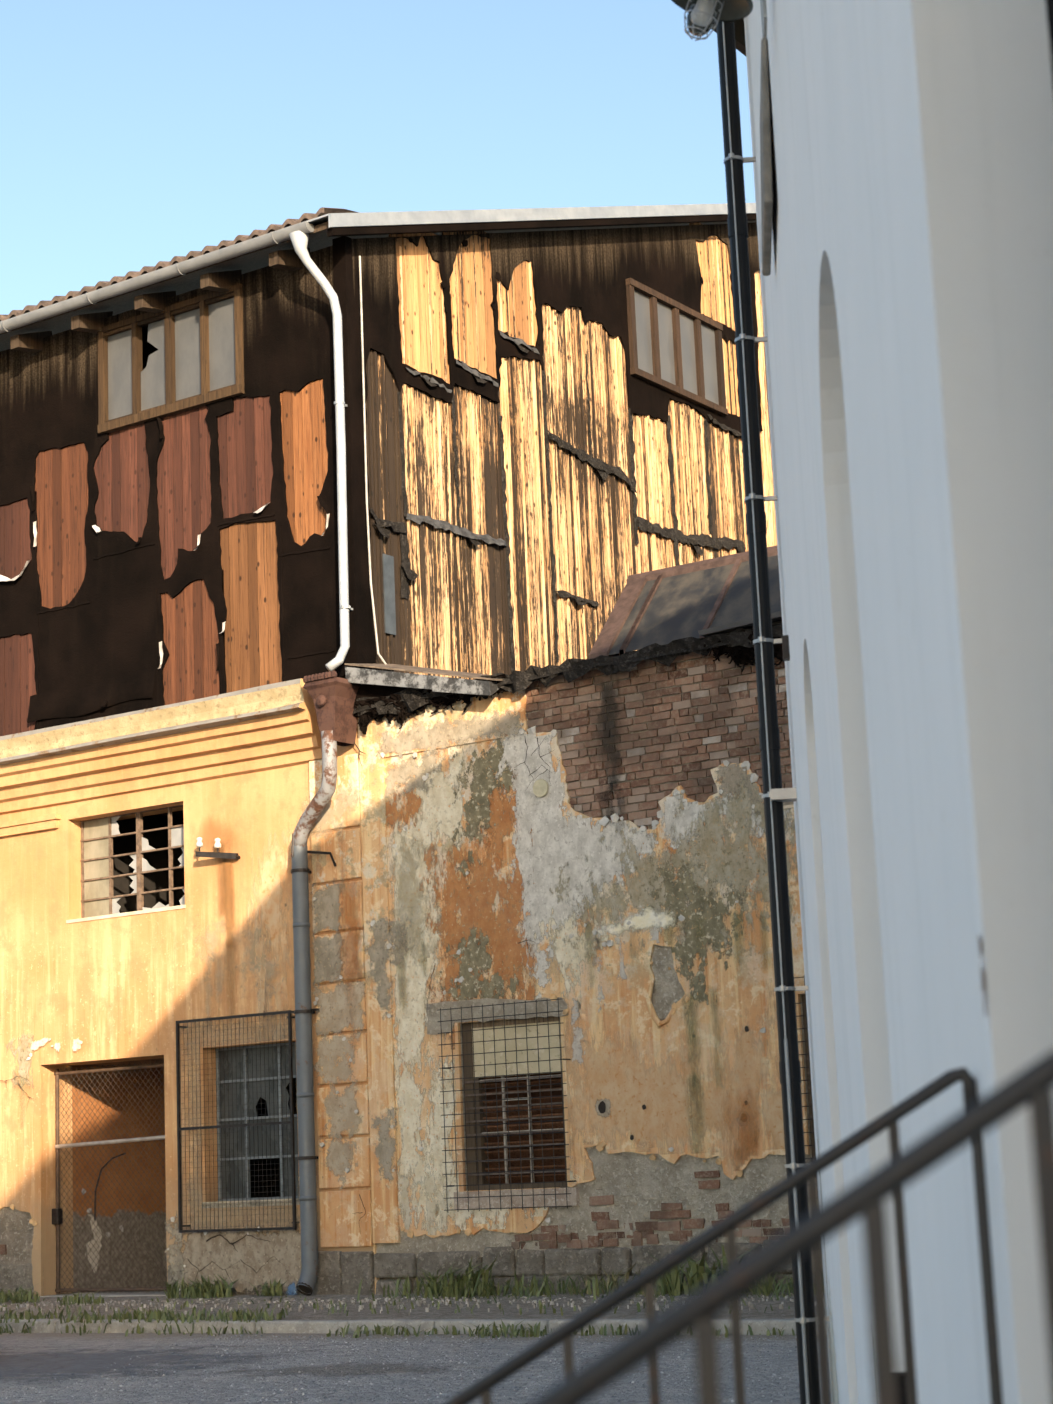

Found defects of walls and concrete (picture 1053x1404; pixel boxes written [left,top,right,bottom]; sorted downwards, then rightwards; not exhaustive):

peeling [389,231,541,393]
peeling [548,430,637,493]
peeling [0,379,330,705]
peeling [556,590,599,606]
spalling [774,657,793,788]
damp [550,679,770,1045]
damp [784,816,798,880]
spalling [376,651,790,1258]
peeling [31,1037,83,1052]
spalling [0,1204,38,1264]